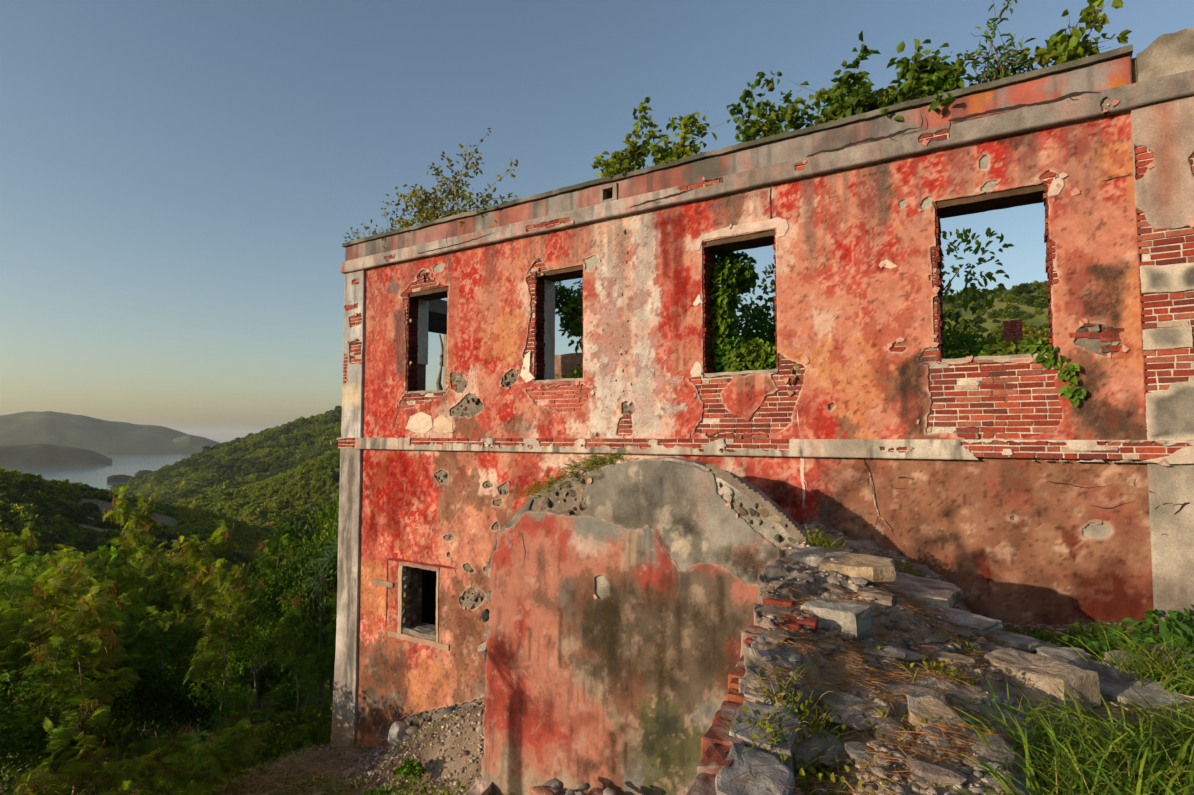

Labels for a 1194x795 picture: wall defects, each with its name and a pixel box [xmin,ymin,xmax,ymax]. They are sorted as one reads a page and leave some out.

crack [807,91,1100,157]
flaking render [979,152,1002,193]
spalling [1039,170,1080,196]
spalling [1134,145,1155,180]
spalling [887,337,906,352]
spalling [916,208,1194,466]
spalling [395,259,810,551]
crack [864,458,913,532]
flaking render [1082,519,1112,539]
spalling [460,563,487,610]
water stain [726,551,765,581]
water stain [584,594,680,689]